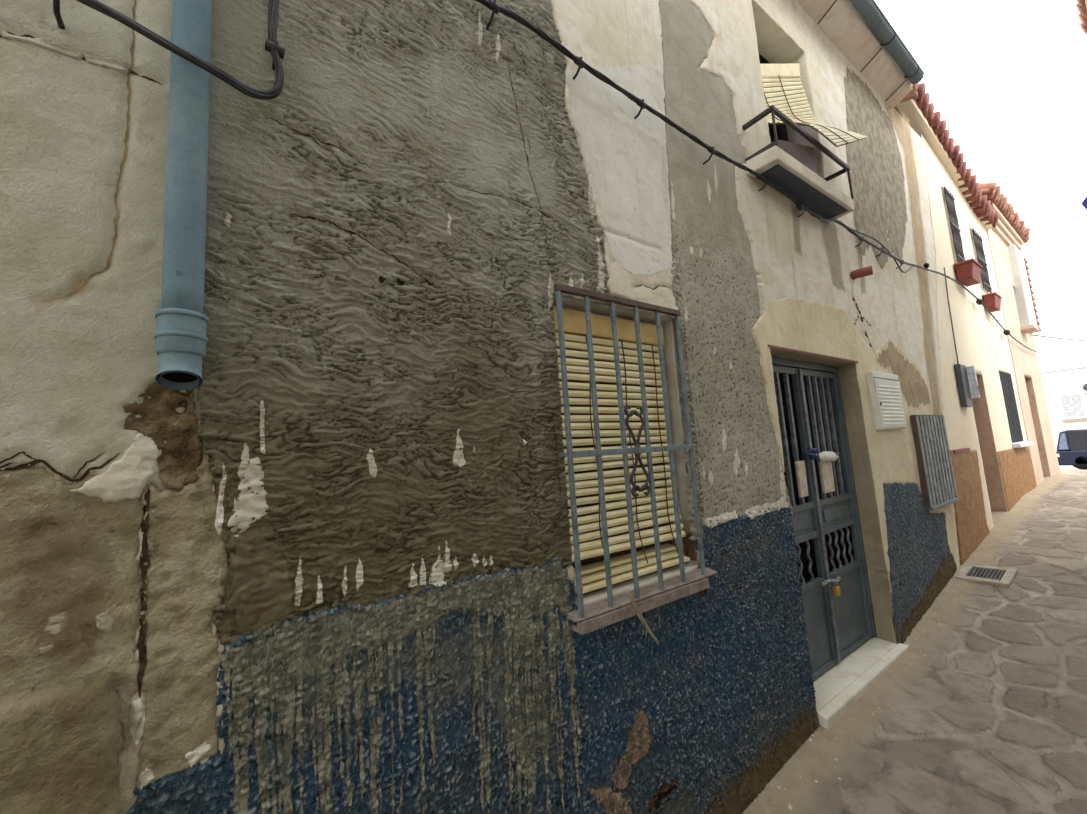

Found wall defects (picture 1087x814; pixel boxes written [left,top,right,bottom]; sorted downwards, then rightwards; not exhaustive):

crack [0,0,161,302]
crack [0,451,120,482]
crack [137,485,150,698]
peeling [0,0,610,790]
damp [221,600,403,814]
damp [415,593,436,814]
damp [471,568,581,814]
peeling [561,0,939,601]
peeling [930,503,957,566]